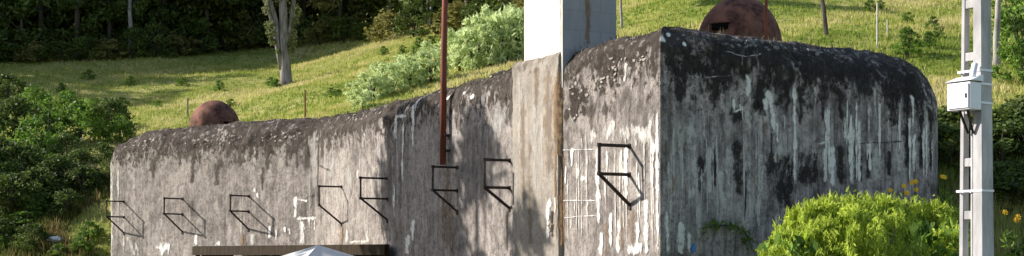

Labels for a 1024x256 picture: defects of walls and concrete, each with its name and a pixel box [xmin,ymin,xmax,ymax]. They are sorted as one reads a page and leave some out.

water stain [178,152,200,183]
water stain [238,145,271,197]
water stain [546,68,934,255]